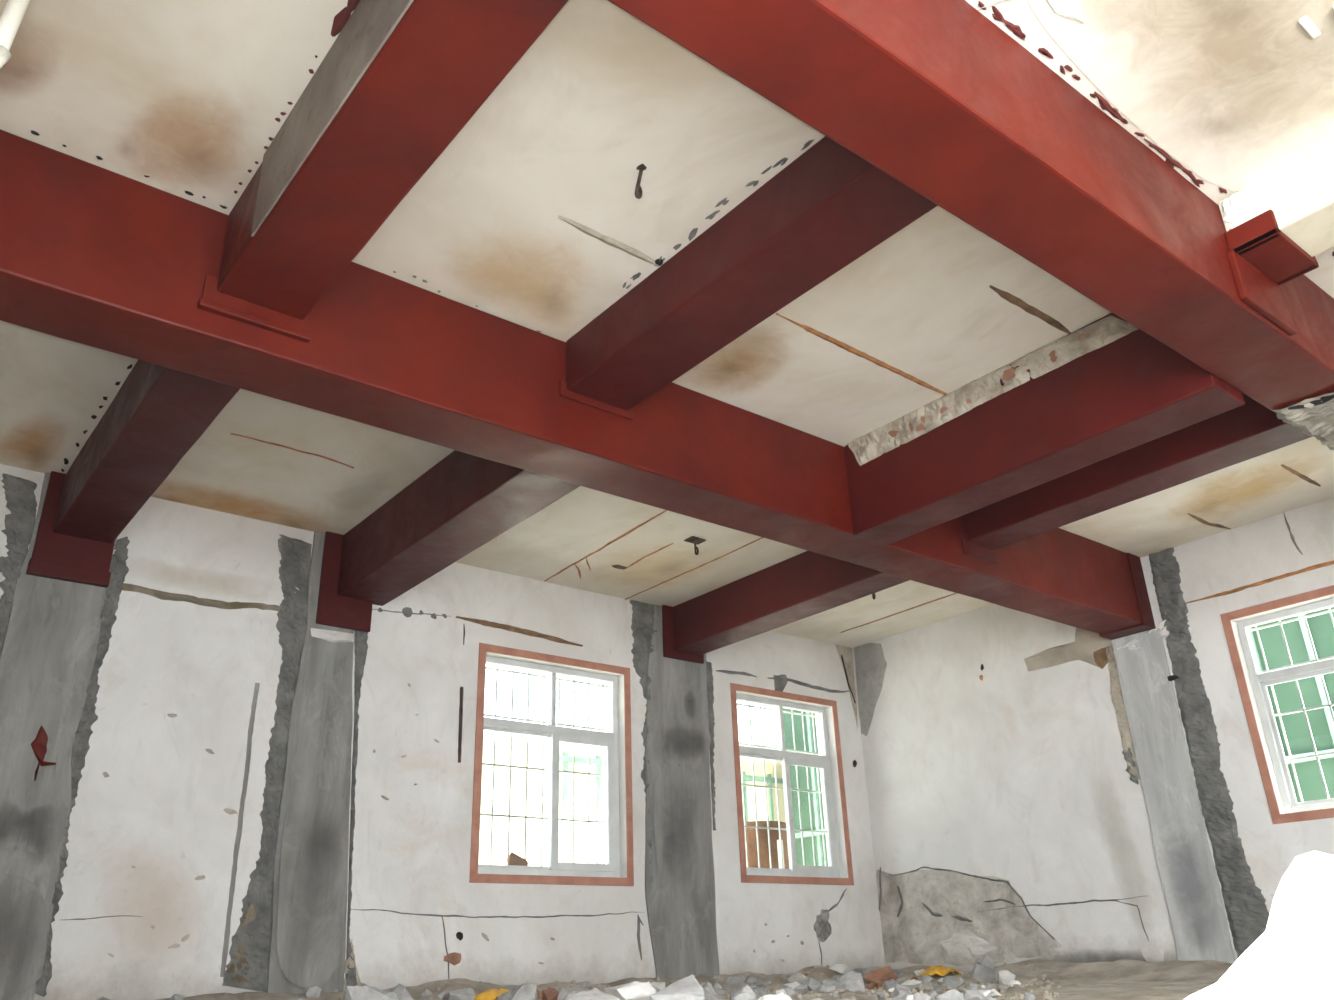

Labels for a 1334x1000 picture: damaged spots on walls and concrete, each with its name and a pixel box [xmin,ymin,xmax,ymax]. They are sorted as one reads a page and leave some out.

flaking render [0,473,37,658]
flaking render [35,537,130,997]